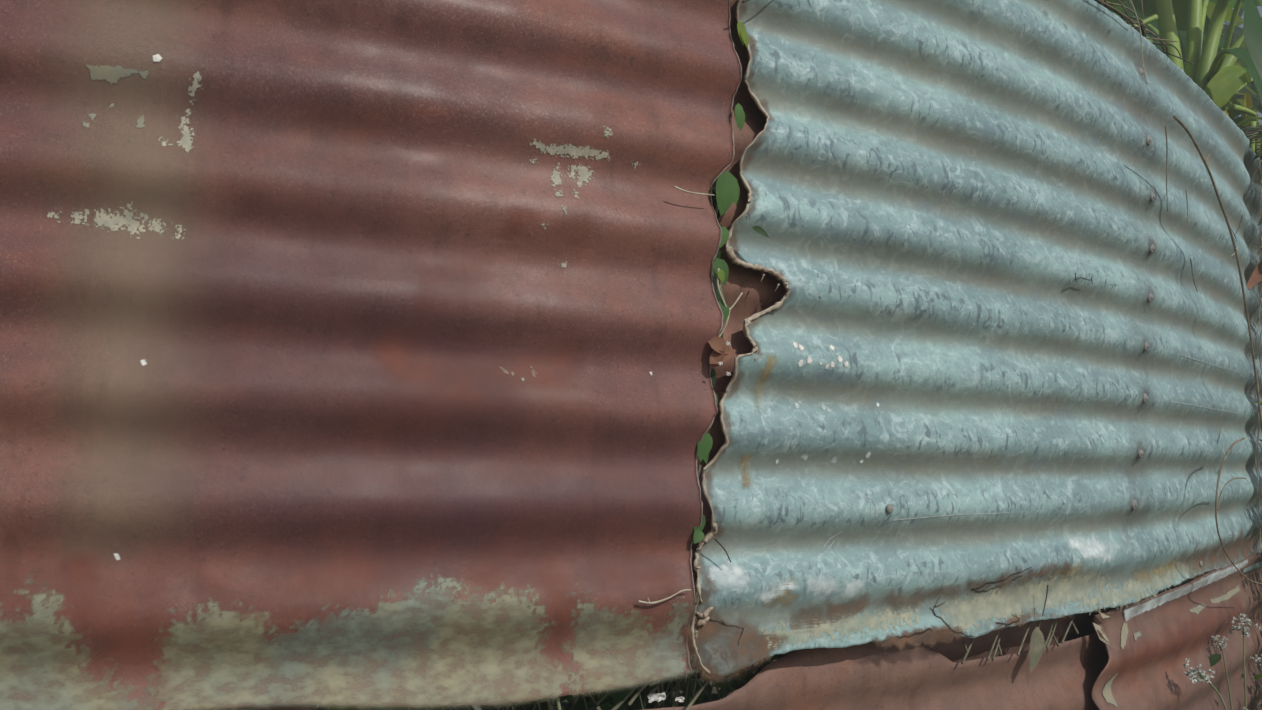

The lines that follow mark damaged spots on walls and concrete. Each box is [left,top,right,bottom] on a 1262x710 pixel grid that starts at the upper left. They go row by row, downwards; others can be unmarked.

peeling [86,54,162,85]
peeling [159,71,203,152]
peeling [529,126,613,214]
peeling [47,201,185,239]
rust [687,611,783,679]
rust [877,627,963,649]